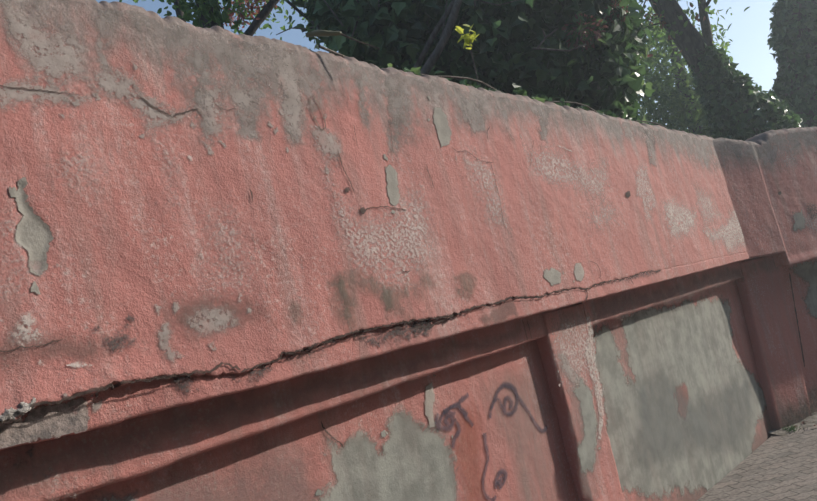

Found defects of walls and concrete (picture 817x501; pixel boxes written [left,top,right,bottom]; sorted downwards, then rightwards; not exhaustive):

crack [0,85,79,95]
crack [138,95,197,118]
leakage [167,26,327,143]
flaking render [7,177,59,294]
peeling [334,154,431,284]
flaking render [0,392,102,449]
peeling [188,307,237,351]
crack [0,262,661,424]
peeling [316,375,457,501]
peeling [552,296,767,498]